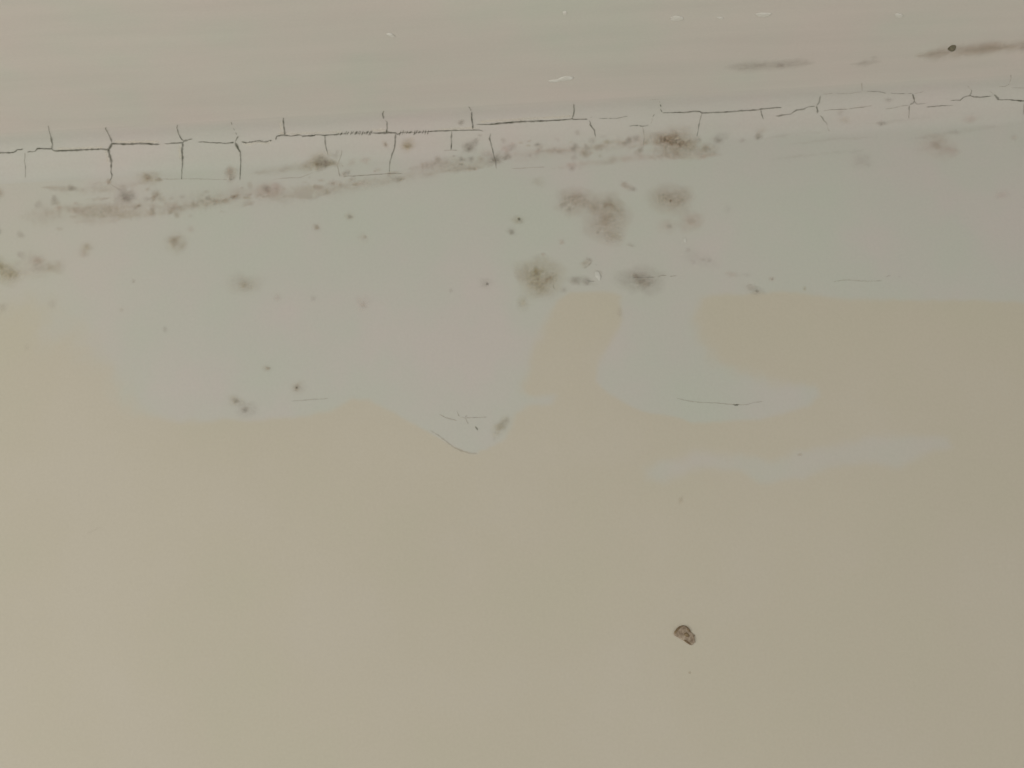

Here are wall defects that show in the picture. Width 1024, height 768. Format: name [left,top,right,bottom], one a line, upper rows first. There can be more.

crack [8,128,183,180]
crack [208,107,592,174]